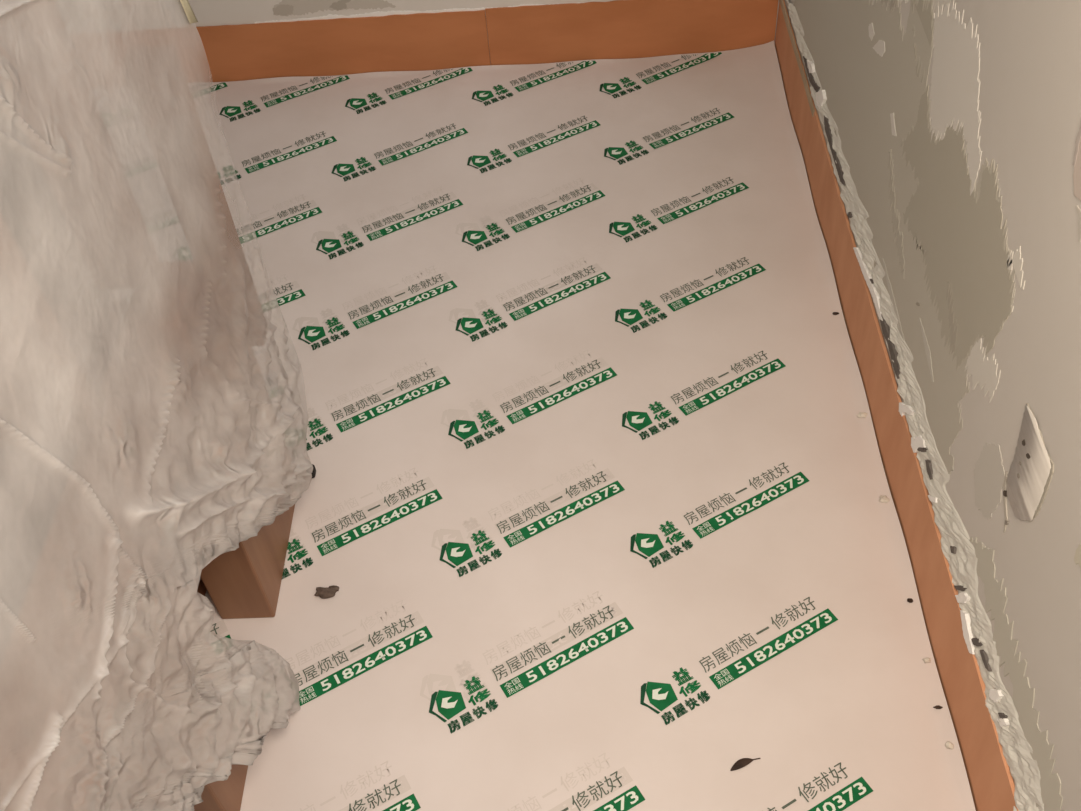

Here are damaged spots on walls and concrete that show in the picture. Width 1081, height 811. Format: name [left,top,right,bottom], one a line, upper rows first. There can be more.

flaking render [273,0,396,16]
flaking render [786,0,1044,811]